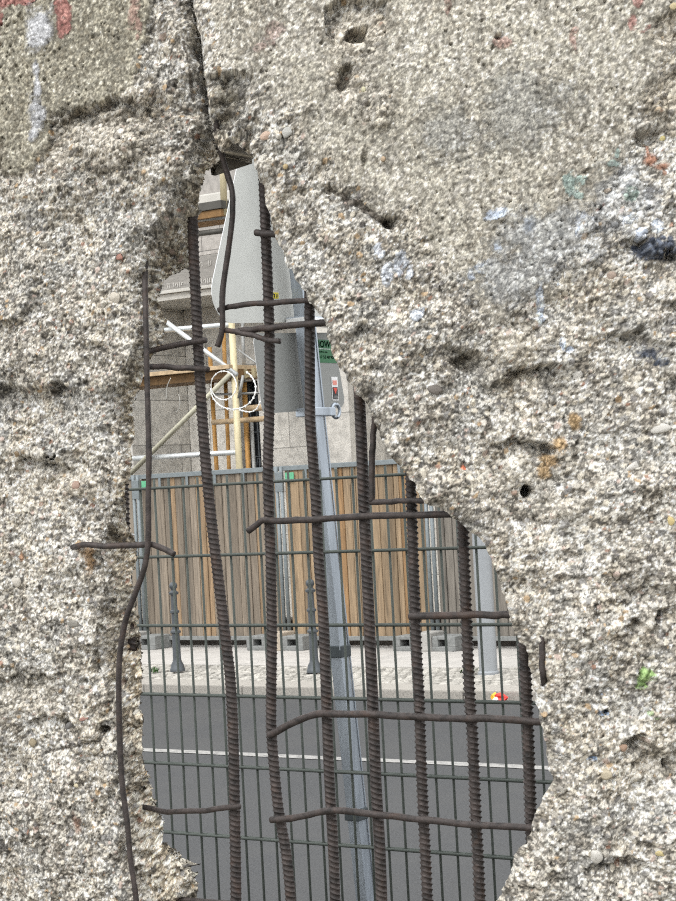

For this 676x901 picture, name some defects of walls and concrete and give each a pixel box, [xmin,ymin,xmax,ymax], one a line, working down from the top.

crack [182,41,195,101]
peeling [484,207,509,220]
peeling [373,242,413,286]
peeling [410,307,425,322]
peeling [535,283,545,324]
spalling [455,349,567,402]
spalling [488,436,594,524]